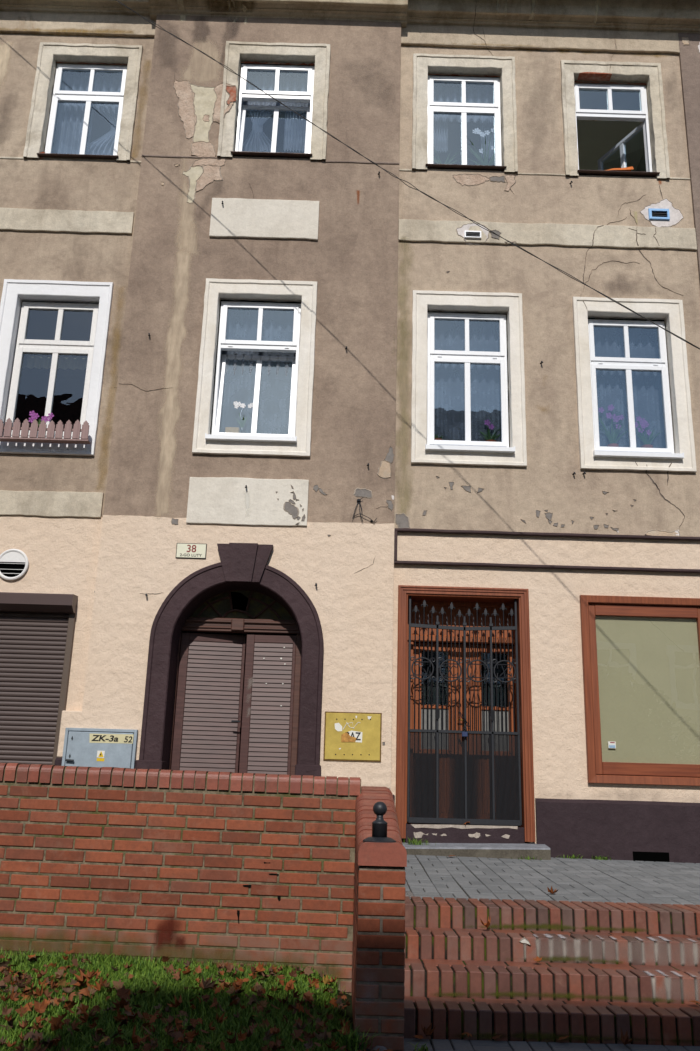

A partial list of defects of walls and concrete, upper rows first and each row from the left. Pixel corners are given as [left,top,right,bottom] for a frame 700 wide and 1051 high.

peeling [173,79,238,204]
crack [583,185,684,308]
peeling [276,485,306,525]
peeling [521,510,574,527]
crack [636,463,685,528]